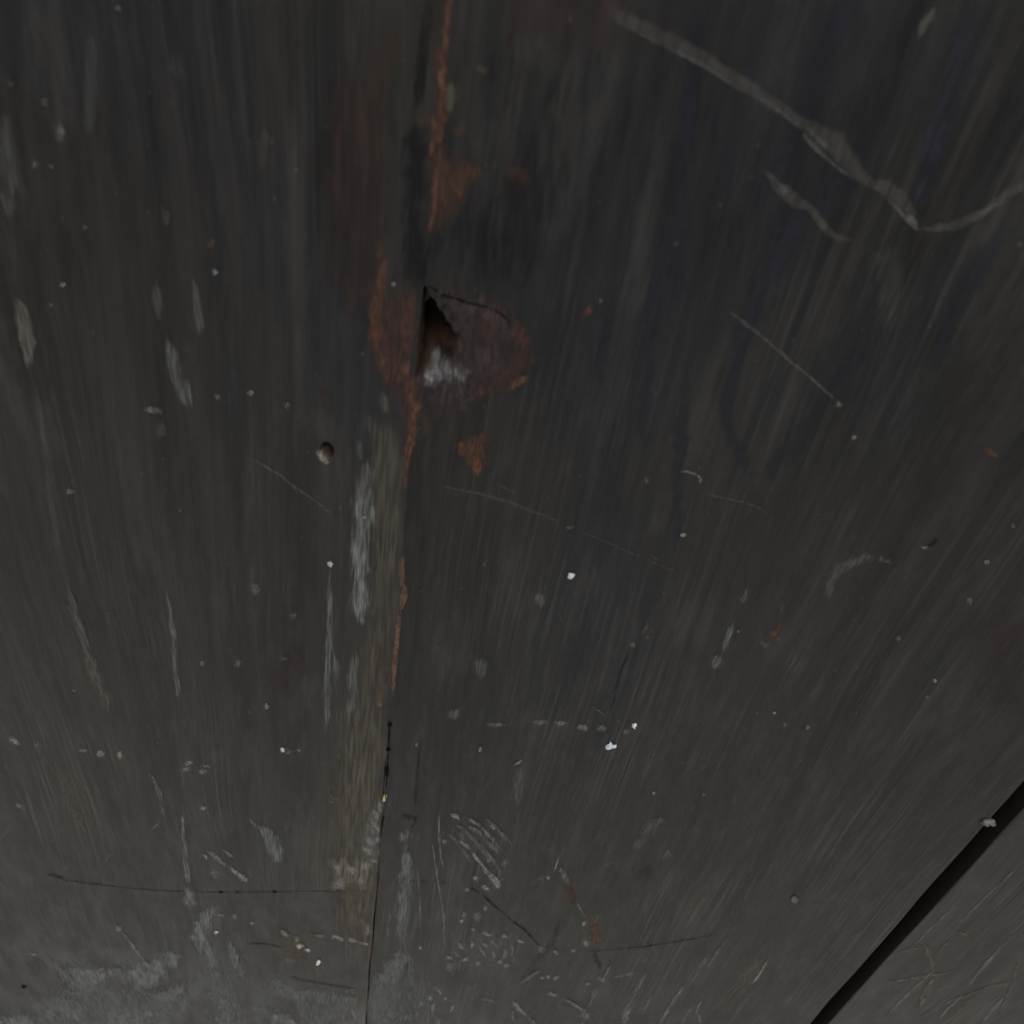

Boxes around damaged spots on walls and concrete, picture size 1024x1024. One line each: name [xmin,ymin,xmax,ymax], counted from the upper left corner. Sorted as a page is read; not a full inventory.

corrosion [371,260,421,487]
crack [384,722,392,785]